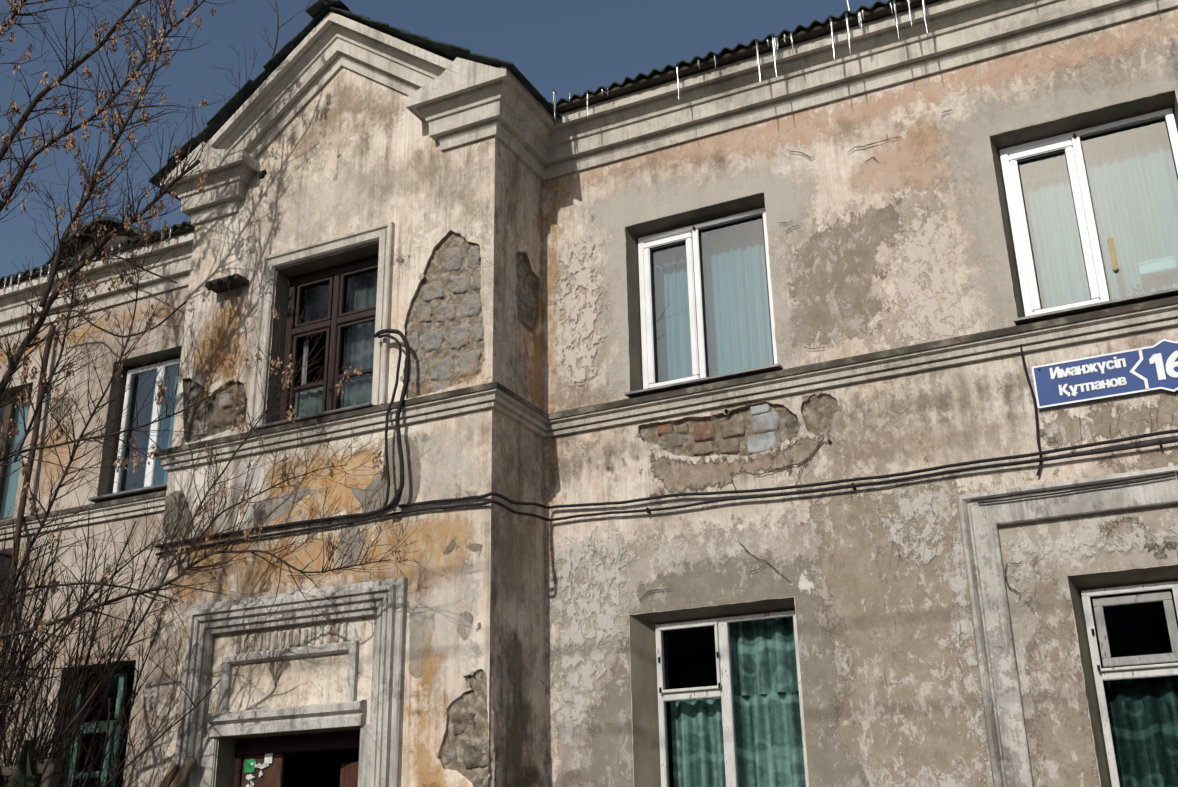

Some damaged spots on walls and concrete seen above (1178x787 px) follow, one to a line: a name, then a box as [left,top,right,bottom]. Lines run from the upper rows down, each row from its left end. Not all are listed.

spalling [400,231,485,398]
spalling [515,251,539,333]
spalling [182,377,248,442]
spalling [435,669,495,787]
peeling [545,389,994,787]
peeling [998,504,1178,787]